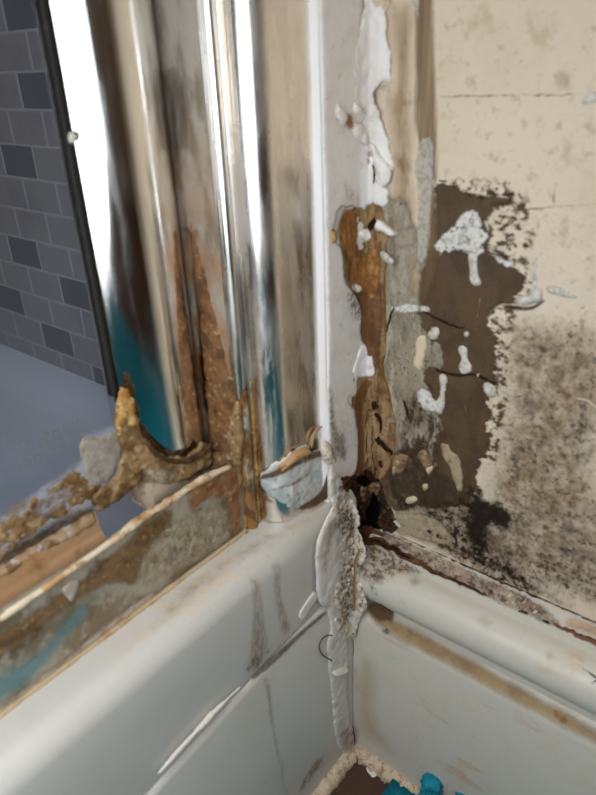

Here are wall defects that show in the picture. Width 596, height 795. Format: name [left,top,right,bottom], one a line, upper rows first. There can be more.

corrosion [0,512,172,658]
corrosion [187,222,261,536]
peeling [318,0,534,511]
leakage [334,332,596,624]
crack [363,536,596,646]